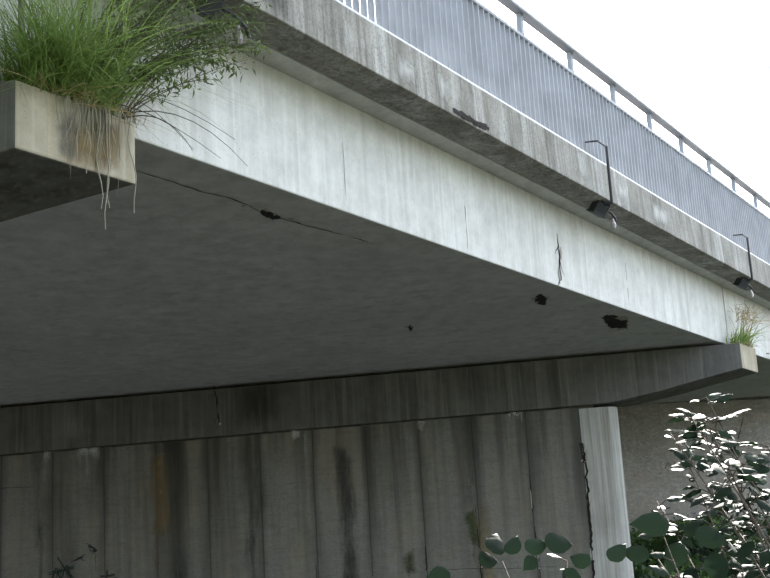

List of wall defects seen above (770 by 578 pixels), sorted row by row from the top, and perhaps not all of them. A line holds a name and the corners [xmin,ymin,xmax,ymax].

spalling [453,108,489,131]
crack [555,236,564,287]
spalling [601,315,628,330]
damp [338,450,356,578]
crack [449,477,541,578]
crack [565,443,595,578]